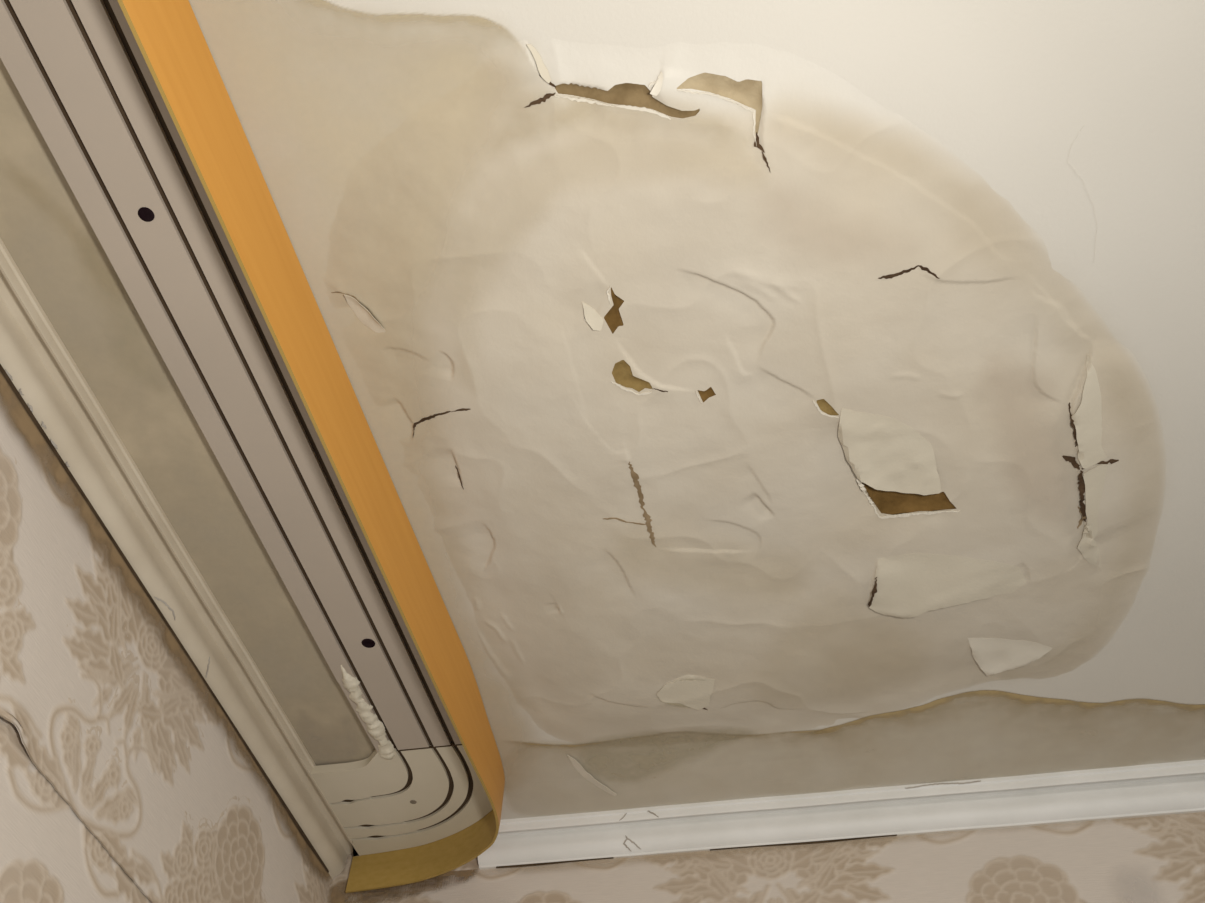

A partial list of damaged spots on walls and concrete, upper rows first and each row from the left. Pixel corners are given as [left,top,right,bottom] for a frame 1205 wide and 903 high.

peeling [650,72,663,96]
damp [190,0,500,704]
peeling [582,302,604,331]
crack [603,462,656,547]
crack [1062,402,1119,528]
crack [0,364,329,873]
damp [0,371,476,903]
damp [783,690,1205,734]